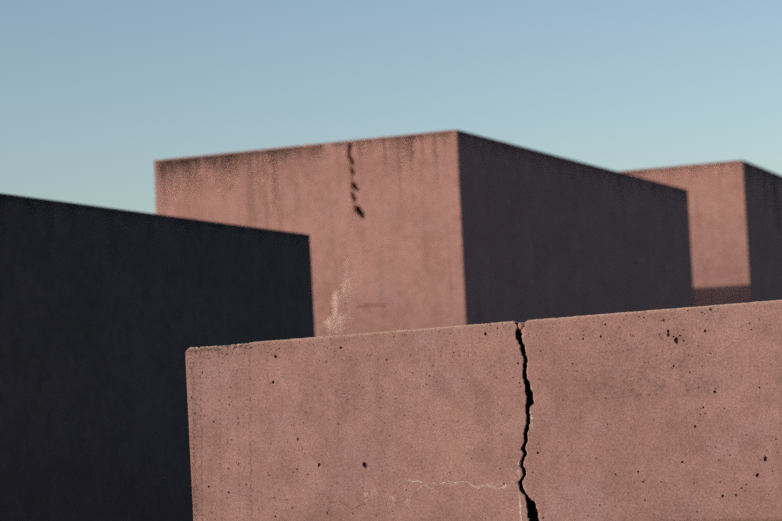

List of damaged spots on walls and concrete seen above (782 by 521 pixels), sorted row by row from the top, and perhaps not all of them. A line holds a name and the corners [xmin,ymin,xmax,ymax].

crack [347,143,365,219]
crack [409,321,542,521]